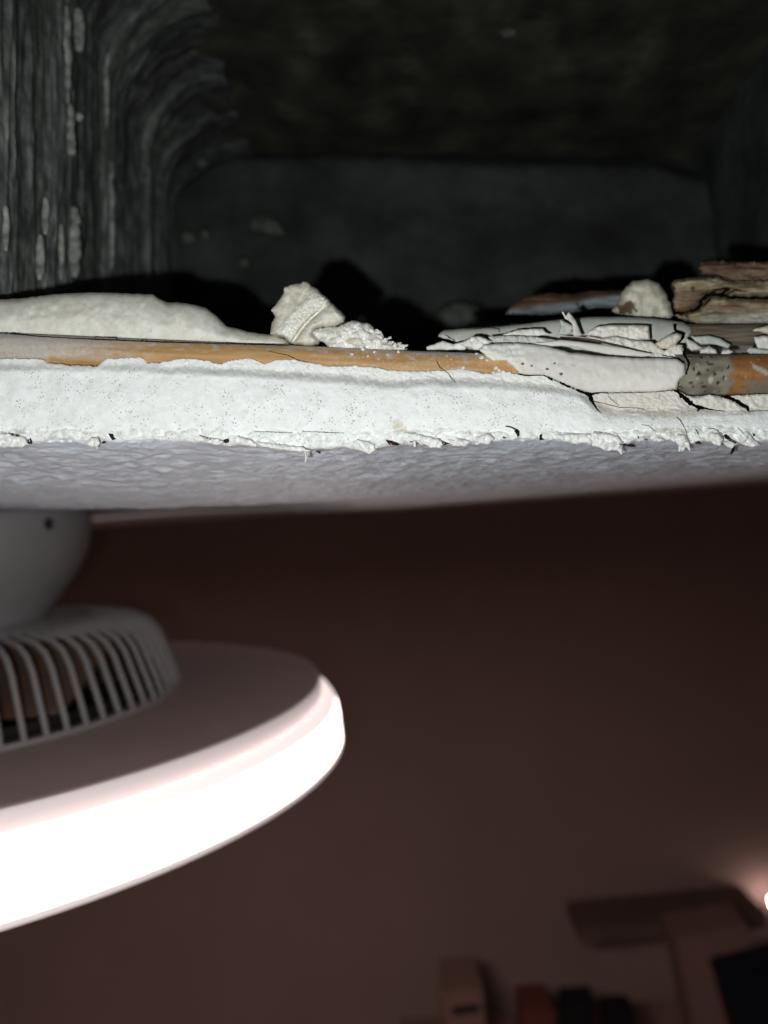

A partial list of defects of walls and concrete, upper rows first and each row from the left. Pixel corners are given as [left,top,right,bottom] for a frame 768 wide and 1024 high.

peeling [562,312,582,337]
crack [518,293,768,441]
peeling [0,433,32,448]
peeling [85,434,115,449]
peeling [200,435,321,463]
peeling [352,426,520,454]
peeling [539,431,760,455]